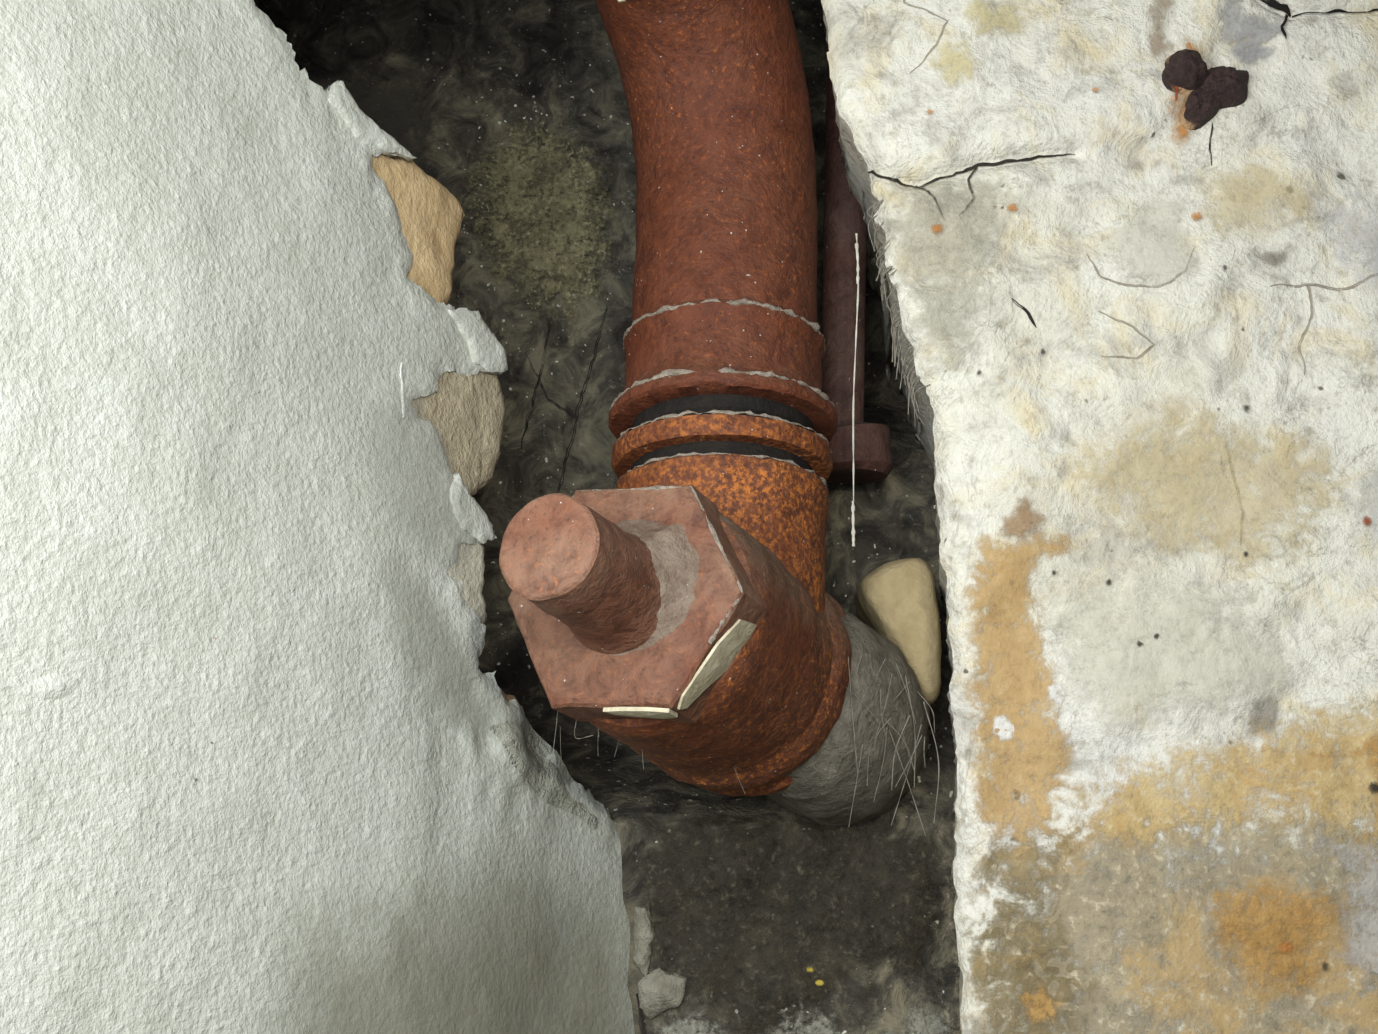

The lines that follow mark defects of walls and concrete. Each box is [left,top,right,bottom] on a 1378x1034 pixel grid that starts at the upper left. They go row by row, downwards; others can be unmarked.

crack [1261,0,1378,39]
rust [1171,86,1193,143]
crack [868,153,1075,220]
spalling [327,81,508,624]
water stain [967,498,1378,1034]
water stain [887,1009,949,1034]